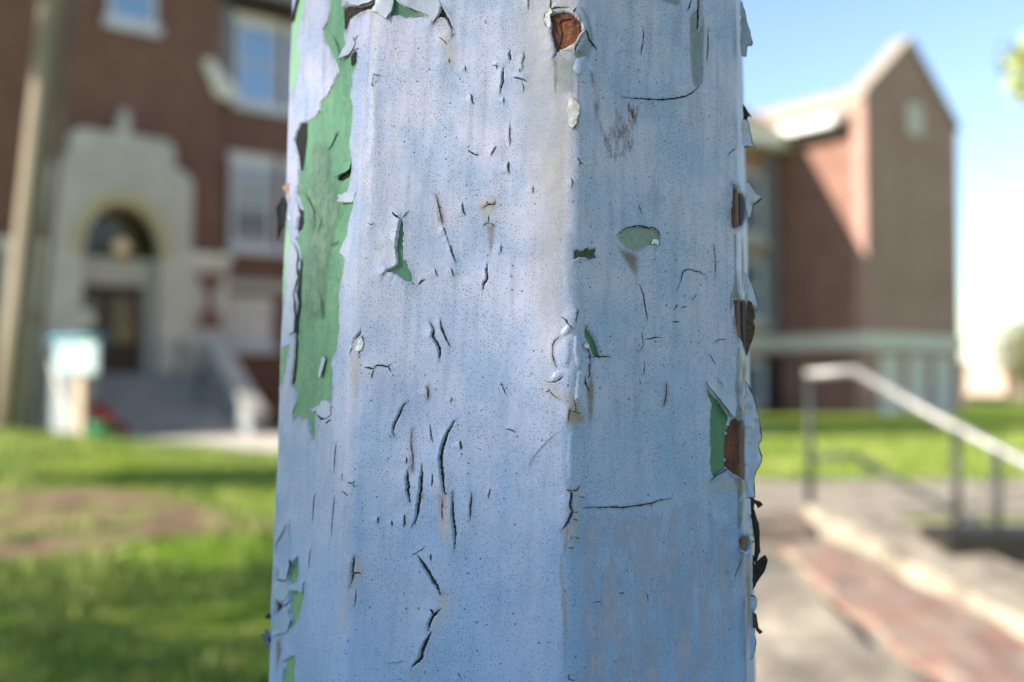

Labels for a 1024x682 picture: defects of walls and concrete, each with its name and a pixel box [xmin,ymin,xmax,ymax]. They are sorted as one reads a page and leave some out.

rust [551,13,583,57]
crack [622,0,709,101]
peeling [276,0,453,440]
crack [412,197,502,289]
peeling [746,183,762,217]
peeling [584,328,599,356]
peeling [744,272,758,356]
rust [724,417,745,482]
crack [377,387,490,666]
crack [562,486,672,549]
peeling [706,380,768,659]
peeling [262,560,304,648]